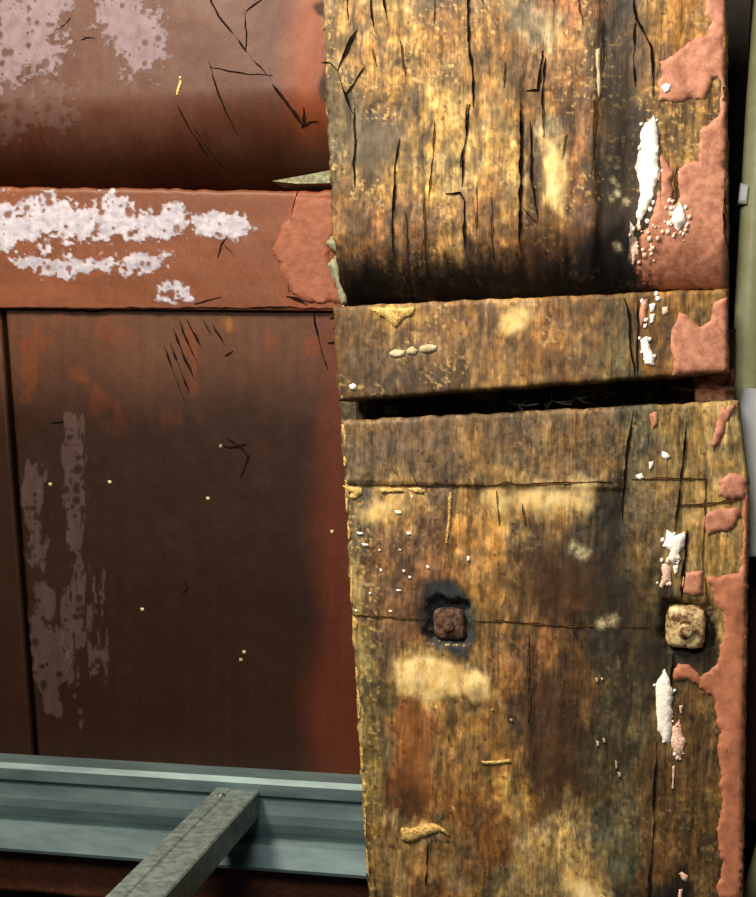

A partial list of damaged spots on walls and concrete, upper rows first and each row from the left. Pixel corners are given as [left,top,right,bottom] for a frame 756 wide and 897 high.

peeling [0,0,74,95]
peeling [0,188,257,280]
peeling [89,0,172,81]
crack [10,283,335,399]
peeling [157,281,194,304]
crack [208,0,319,135]
crack [321,0,387,187]
crack [391,0,493,273]
crack [518,50,566,245]
crack [633,0,655,98]
peeling [630,0,729,376]
peeling [661,473,749,897]